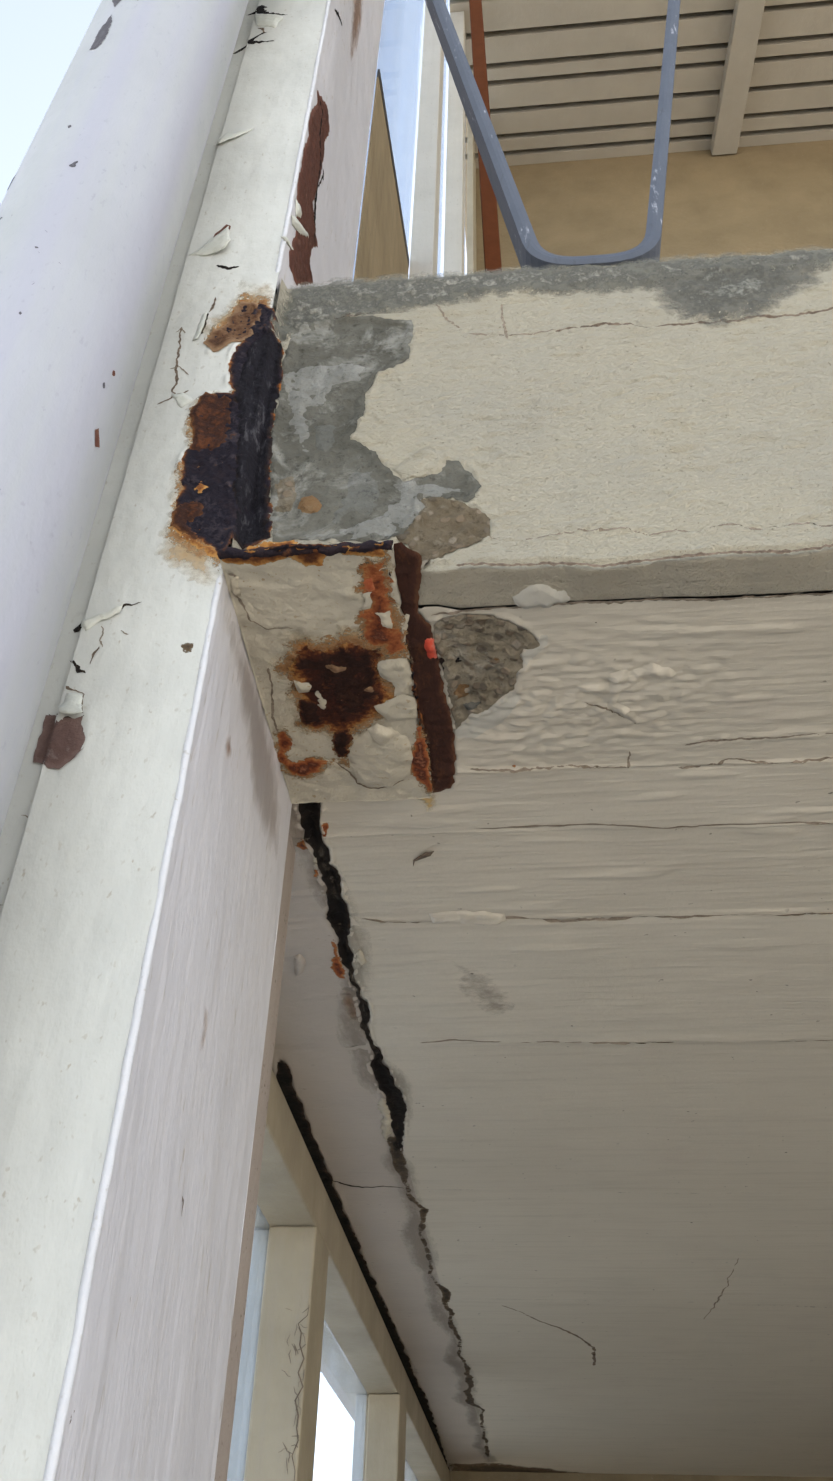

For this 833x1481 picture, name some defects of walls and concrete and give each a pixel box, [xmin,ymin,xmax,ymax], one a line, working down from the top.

spalling [269,316,490,570]
rust [165,292,456,807]
peeling [33,660,86,769]
spalling [434,584,570,738]
crack [506,915,723,923]
crack [758,910,833,918]
crack [421,1038,673,1046]
crack [296,802,490,1457]